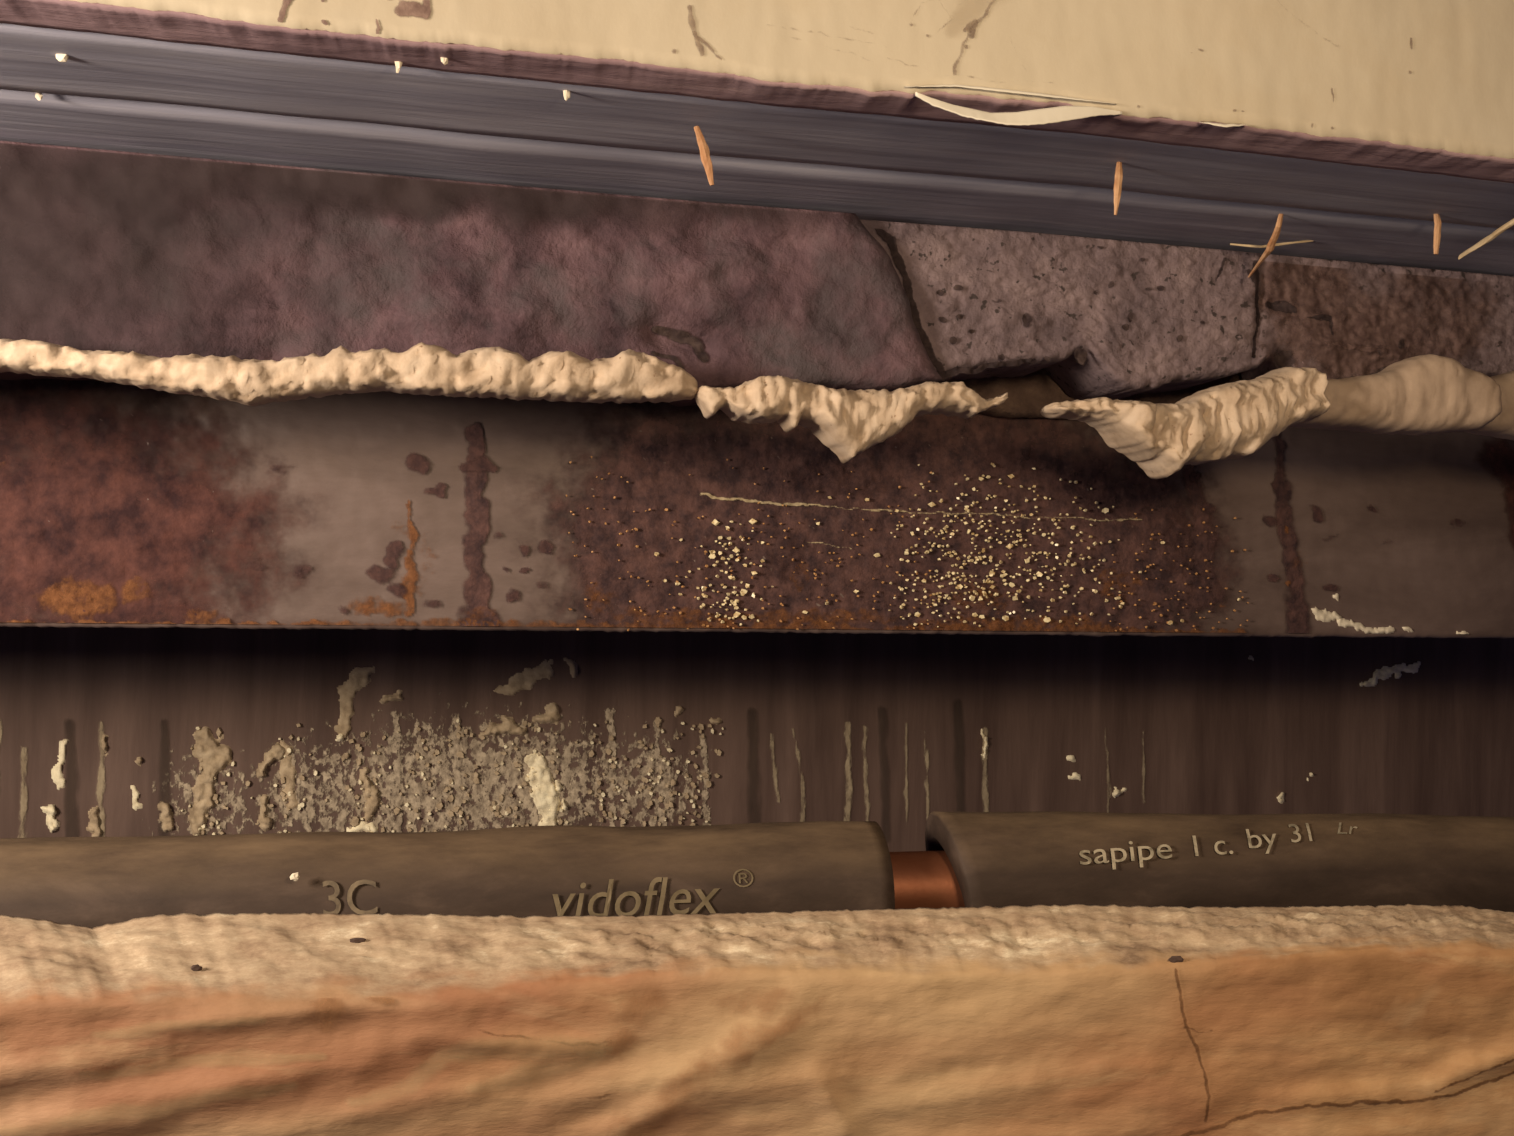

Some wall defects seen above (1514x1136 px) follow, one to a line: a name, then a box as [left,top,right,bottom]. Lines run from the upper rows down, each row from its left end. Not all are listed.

peeling [278,0,292,22]
peeling [395,0,431,19]
crack [910,8,988,73]
crack [875,228,1033,381]
crack [1216,257,1334,358]
corrosion [0,379,1246,633]
damp [808,504,1030,519]
corrosion [1263,435,1309,633]
damp [130,657,724,836]
damp [749,711,780,813]
crack [1175,968,1514,1136]